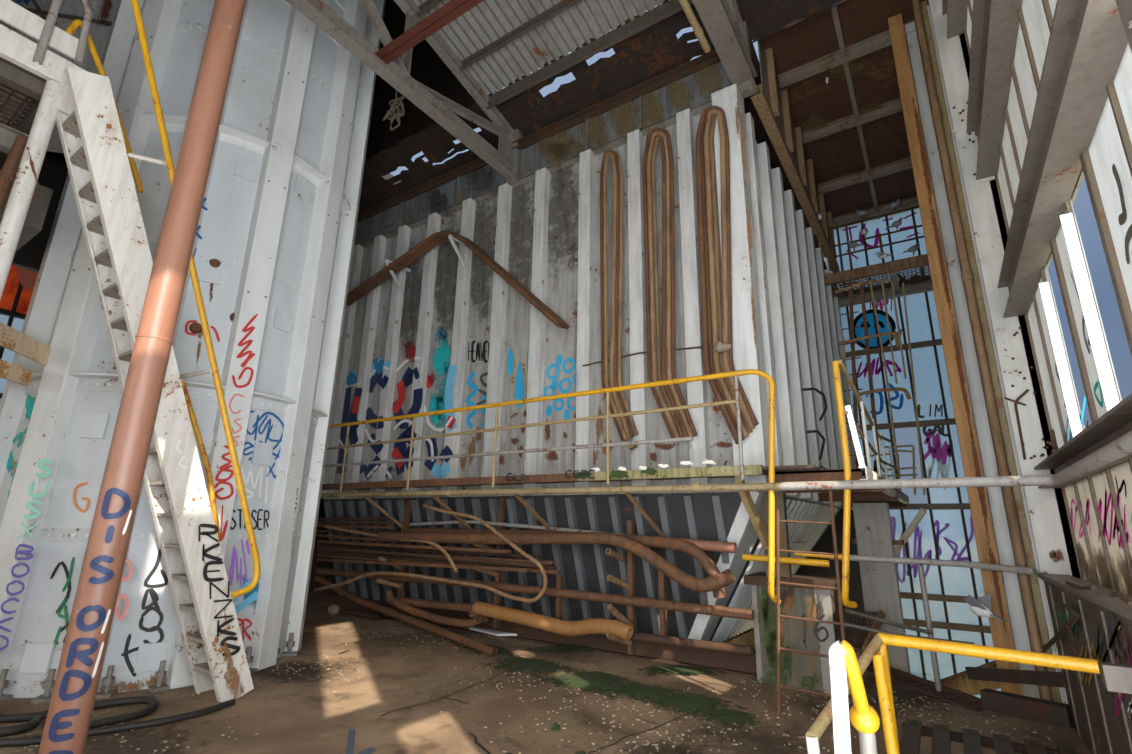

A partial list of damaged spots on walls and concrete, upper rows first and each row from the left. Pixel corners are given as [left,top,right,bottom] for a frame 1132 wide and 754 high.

corrosion [912,99,1006,630]
corrosion [223,644,244,700]